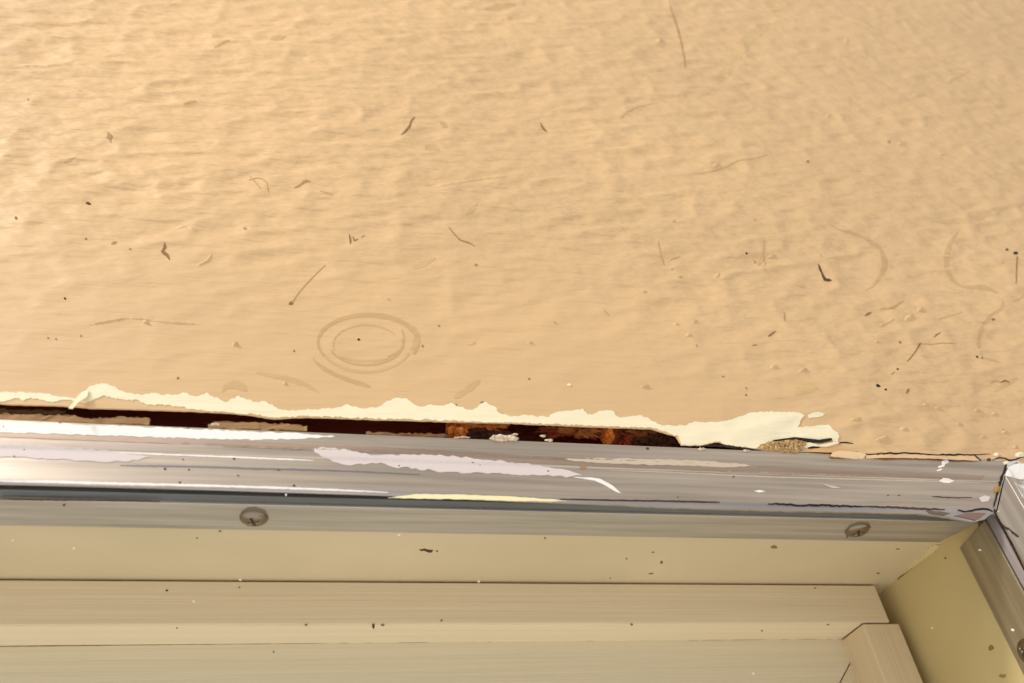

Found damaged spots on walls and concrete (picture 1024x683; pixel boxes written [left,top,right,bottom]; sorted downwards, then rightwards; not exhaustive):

peeling [0,383,979,461]